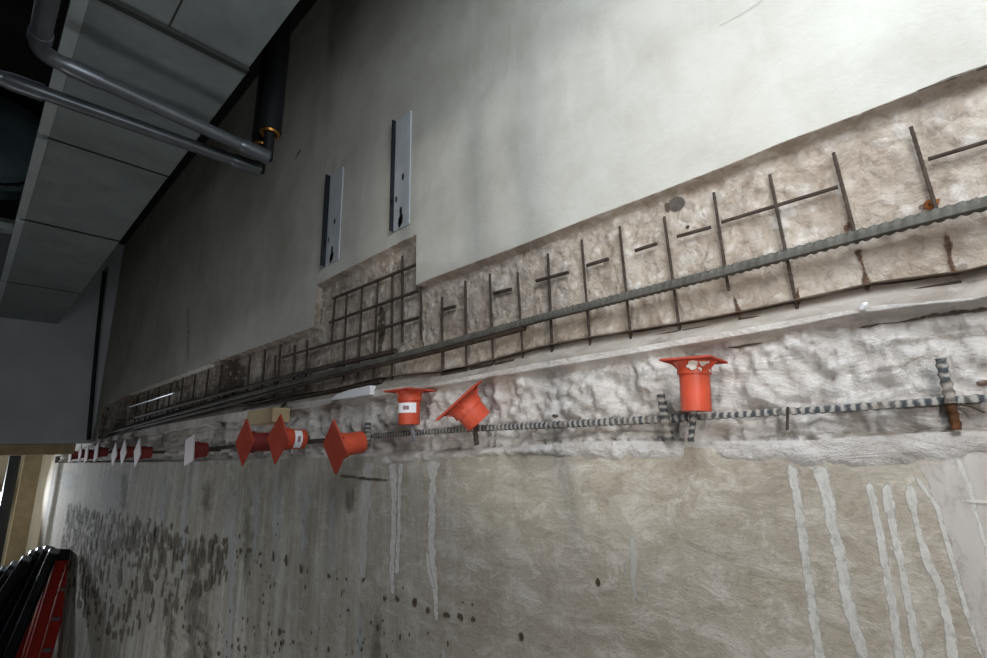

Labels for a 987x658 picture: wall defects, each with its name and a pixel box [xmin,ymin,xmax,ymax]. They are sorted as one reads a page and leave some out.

spalling [57,68,987,463]
water stain [426,460,441,621]
water stain [788,465,826,658]
water stain [813,466,869,658]
water stain [866,452,987,658]